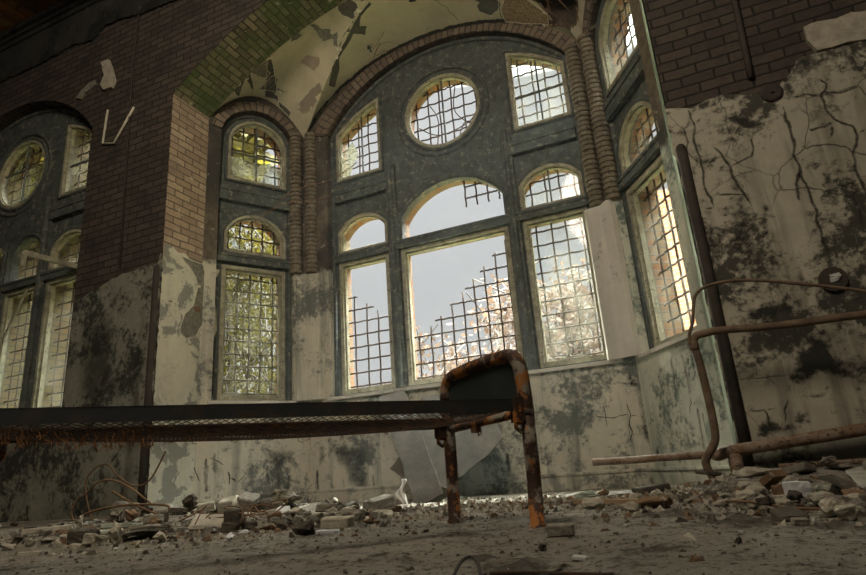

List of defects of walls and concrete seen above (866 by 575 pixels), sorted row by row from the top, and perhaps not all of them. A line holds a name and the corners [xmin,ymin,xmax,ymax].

flaking render [474,0,500,18]
flaking render [232,0,373,117]
crack [688,110,754,209]
damp [734,117,762,130]
crack [783,79,866,252]
flaking render [180,256,206,339]
damp [749,304,792,319]
damp [337,448,374,486]